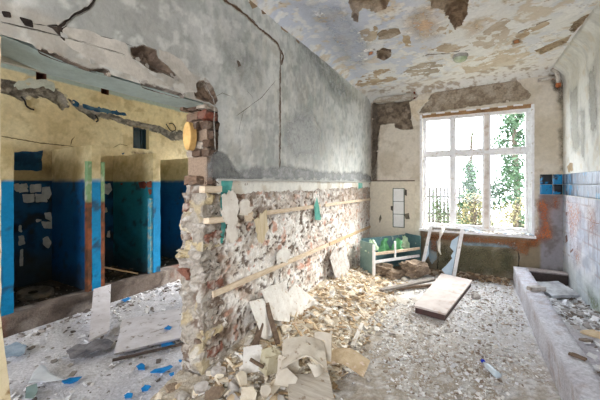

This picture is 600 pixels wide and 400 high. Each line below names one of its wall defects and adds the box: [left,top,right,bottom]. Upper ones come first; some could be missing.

crack [0,0,173,78]
spalling [0,78,183,141]
peeling [36,22,218,105]
crack [223,0,284,168]
spalling [348,0,389,22]
peeling [355,26,443,87]
spalling [371,80,531,171]
spalling [426,0,589,74]
peeling [14,182,52,203]
peeling [36,212,52,248]
peeling [220,181,254,245]
rust [423,198,559,254]